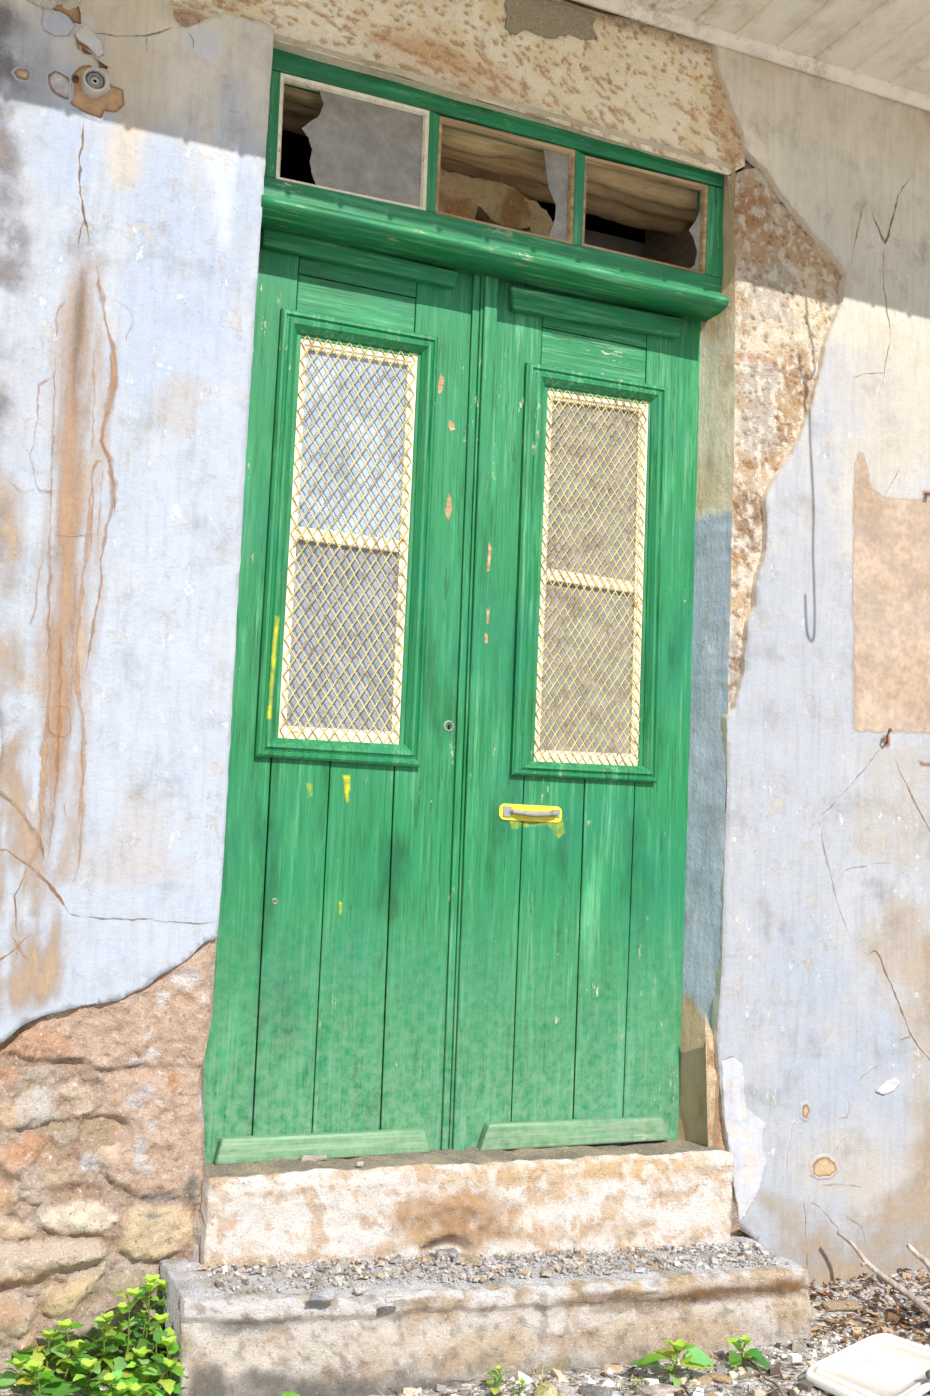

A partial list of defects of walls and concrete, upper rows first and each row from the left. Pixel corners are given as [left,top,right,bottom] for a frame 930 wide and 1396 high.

flaking render [8,3,129,124]
flaking render [170,0,843,711]
crack [851,178,910,379]
peeling [852,454,930,733]
crack [0,788,201,961]
crack [820,750,930,1060]
flaking render [181,1014,789,1295]